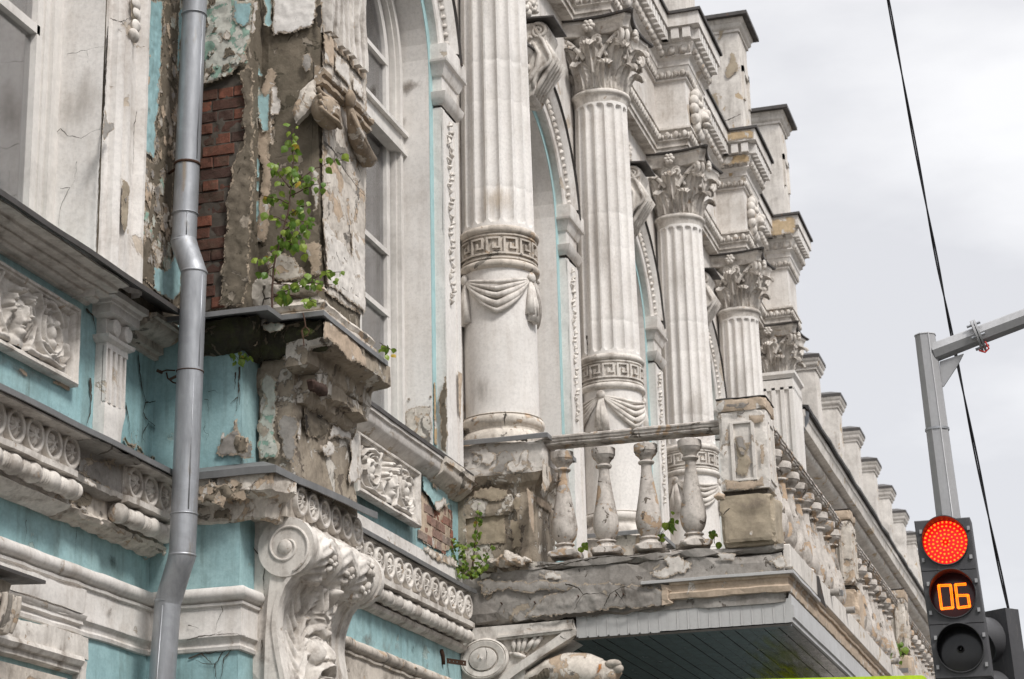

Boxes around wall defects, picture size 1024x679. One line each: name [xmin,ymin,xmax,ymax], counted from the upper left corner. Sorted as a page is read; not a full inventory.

crack [57,18,129,239]
flaking render [143,0,182,301]
flaking render [197,0,367,316]
peeling [261,319,285,333]
peeling [322,321,367,367]
crack [125,353,155,440]
flaking render [198,479,251,519]
peeling [216,373,361,486]
flaking render [417,475,458,568]
flaking render [464,439,556,493]
peeling [717,552,736,561]
peeling [771,555,787,569]